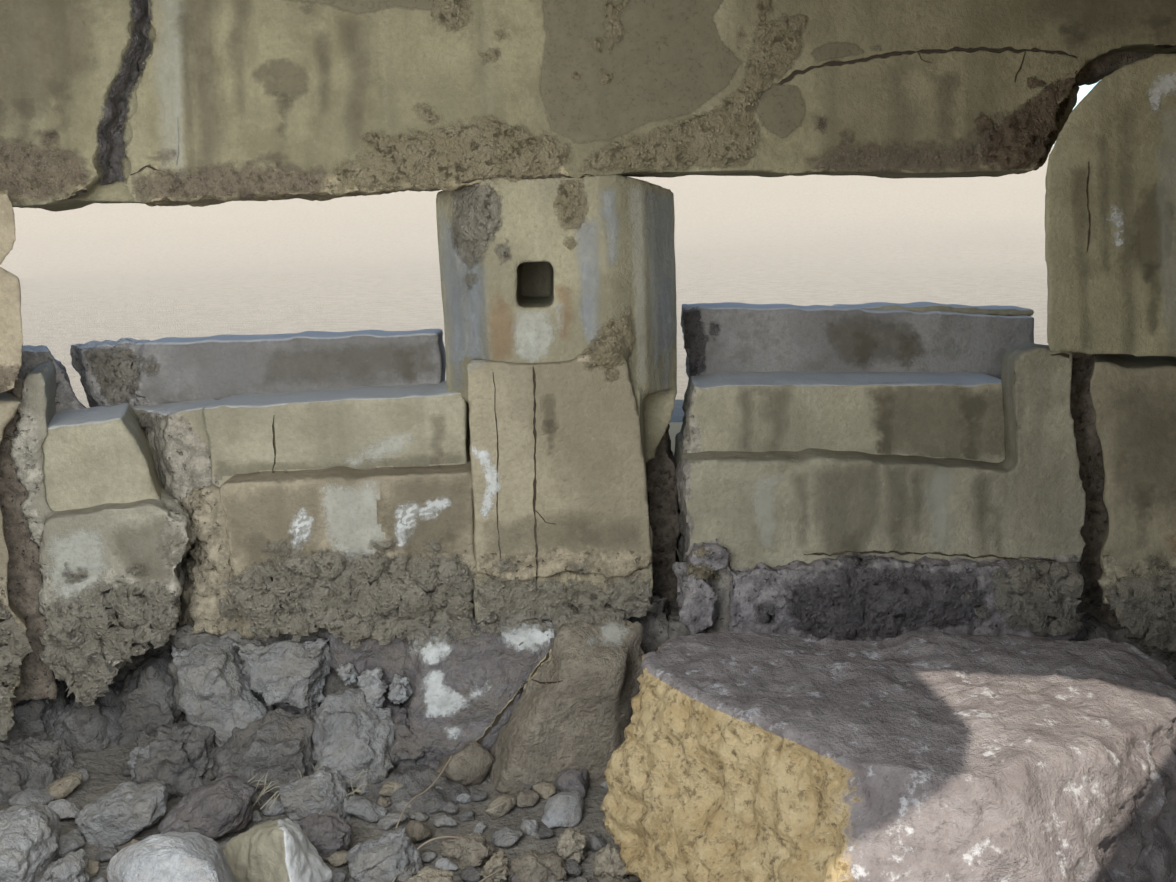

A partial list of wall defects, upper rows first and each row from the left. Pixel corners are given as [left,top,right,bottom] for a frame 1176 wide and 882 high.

crack [63,0,180,200]
crack [757,43,1176,98]
spalling [974,77,1076,170]
damp [1150,72,1176,110]
damp [396,499,451,546]
crack [532,367,556,582]
crack [646,424,680,602]
crack [804,352,1120,629]
spalling [0,563,181,741]
spalling [217,539,658,649]
spalling [753,554,1087,641]